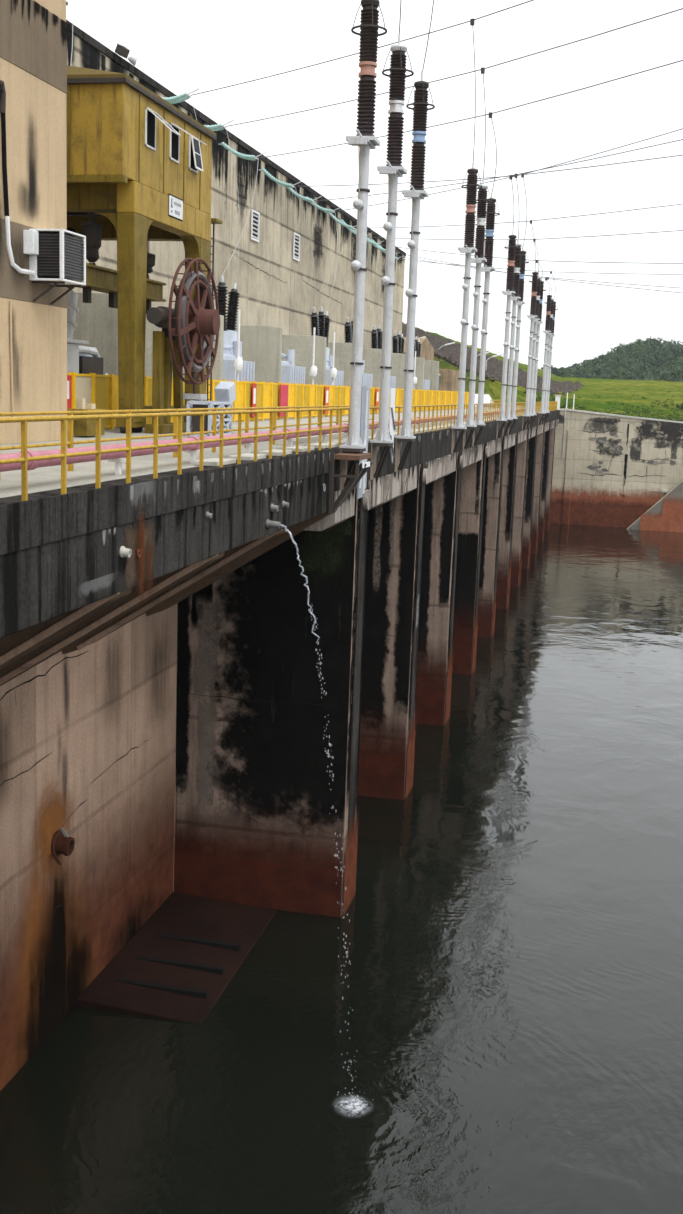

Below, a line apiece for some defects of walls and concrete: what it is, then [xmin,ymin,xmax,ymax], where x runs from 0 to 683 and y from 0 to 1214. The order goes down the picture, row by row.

water stain [11,0,157,94]
water stain [24,131,35,208]
water stain [172,104,402,291]
water stain [584,417,683,480]
water stain [175,411,564,833]
crack [0,651,88,706]
crack [0,740,148,825]